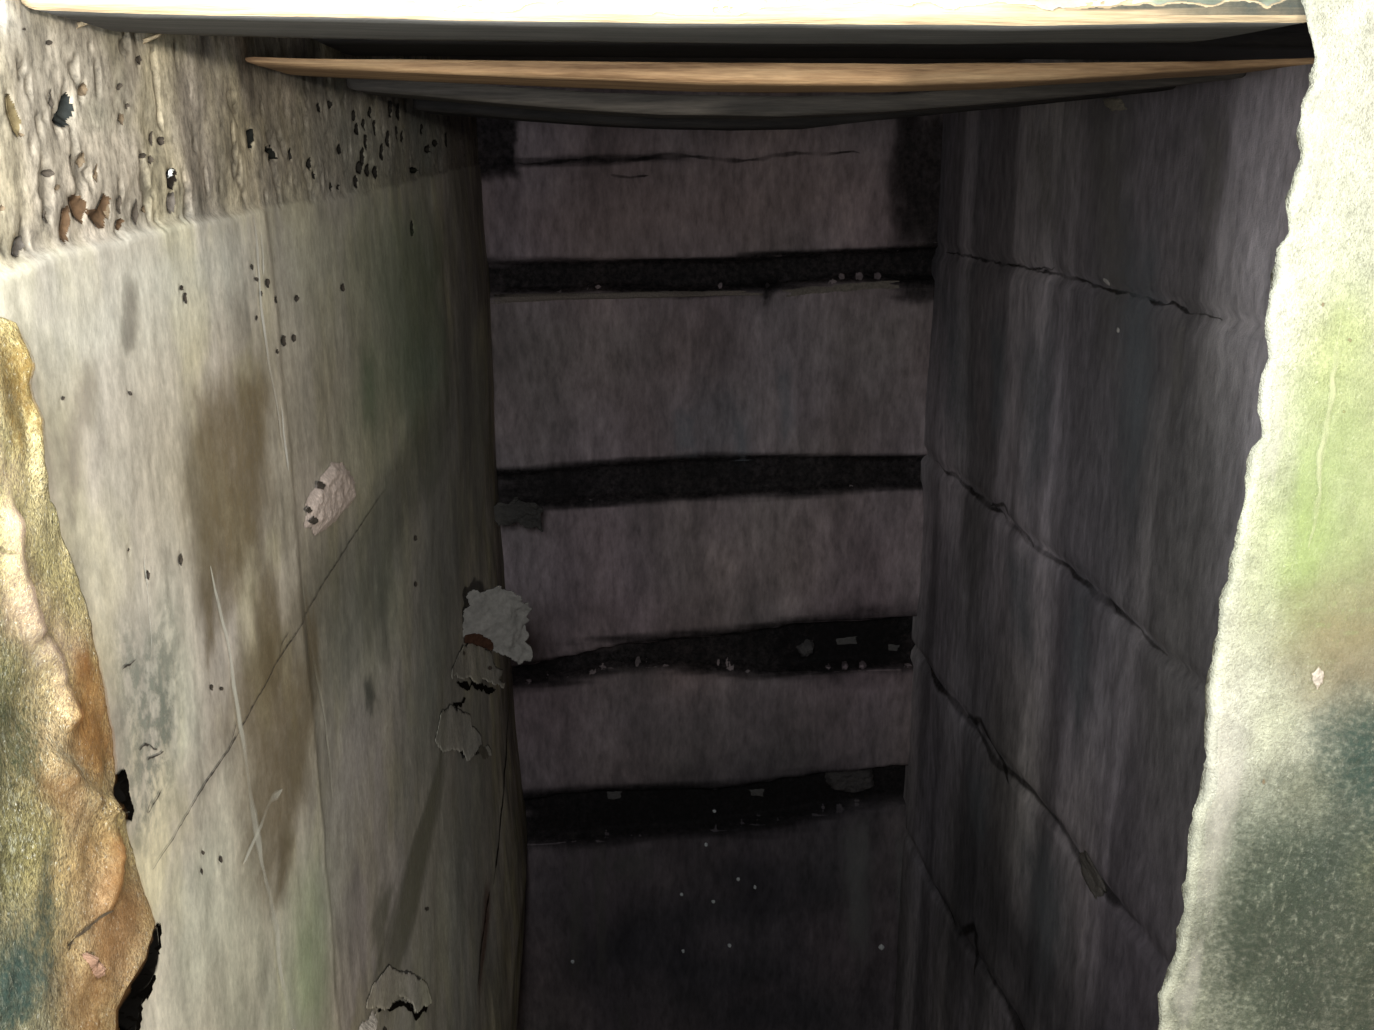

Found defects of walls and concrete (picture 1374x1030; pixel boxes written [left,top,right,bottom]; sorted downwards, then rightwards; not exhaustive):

peeling [414,0,1223,15]
crack [948,252,1222,320]
leakage [196,381,266,639]
spalling [304,462,356,536]
crack [944,470,1005,512]
crack [1062,561,1127,617]
peeling [451,585,533,688]
crack [140,489,386,869]
leakage [241,577,312,863]
peeling [435,704,492,761]
crack [926,660,1057,819]
peeling [359,965,432,1030]